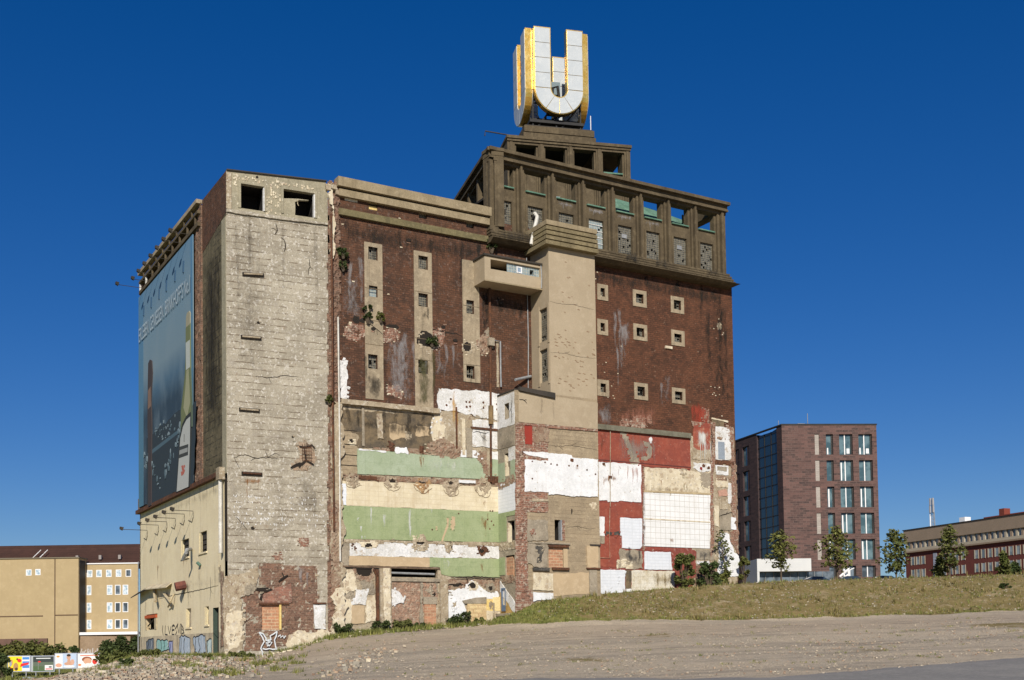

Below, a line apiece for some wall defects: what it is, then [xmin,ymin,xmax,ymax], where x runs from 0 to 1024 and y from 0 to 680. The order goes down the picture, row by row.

spalling [343,315,400,345]
crack [234,444,315,468]
spalling [620,415,653,466]
spalling [218,494,516,655]